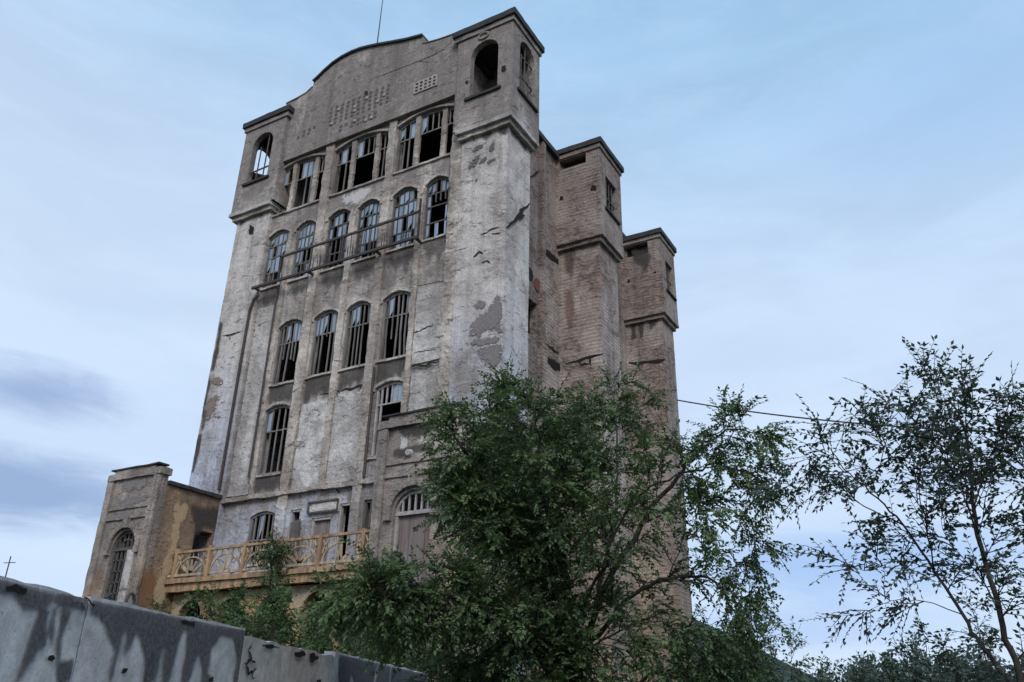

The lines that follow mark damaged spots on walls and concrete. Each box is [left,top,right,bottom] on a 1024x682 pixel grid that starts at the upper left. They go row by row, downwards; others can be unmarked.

peeling [468,140,496,181]
crack [474,203,530,263]
spalling [467,295,506,367]
peeling [153,500,189,605]
water stain [0,580,245,682]
crack [244,642,256,679]